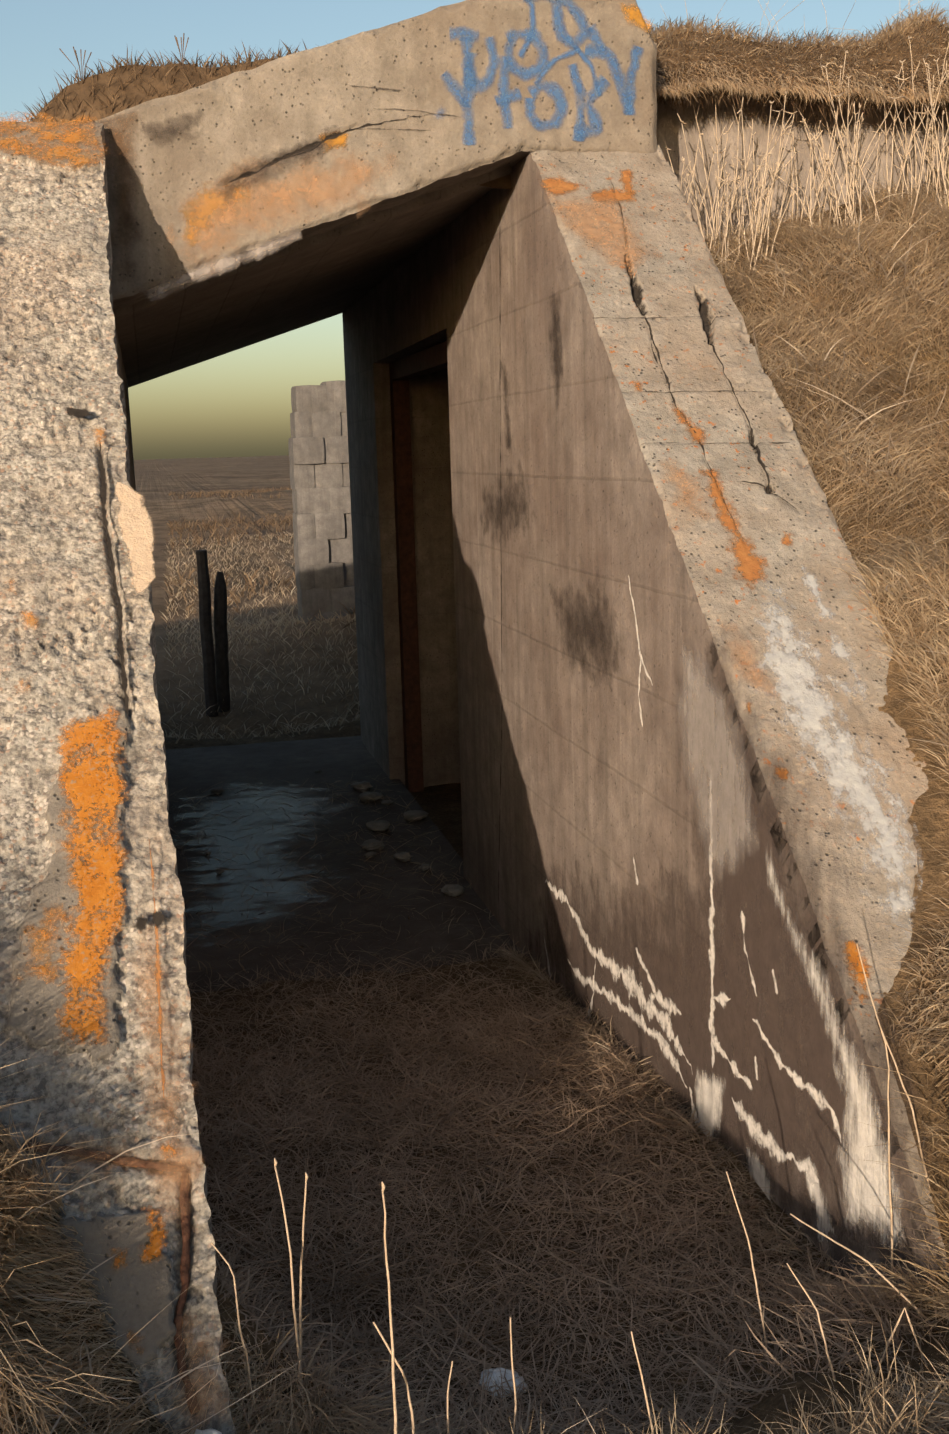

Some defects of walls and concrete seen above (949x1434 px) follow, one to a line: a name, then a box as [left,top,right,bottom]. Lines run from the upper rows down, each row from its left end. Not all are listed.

crack [222,86,457,190]
crack [609,177,796,544]
water stain [628,576,653,727]
water stain [530,657,907,1260]